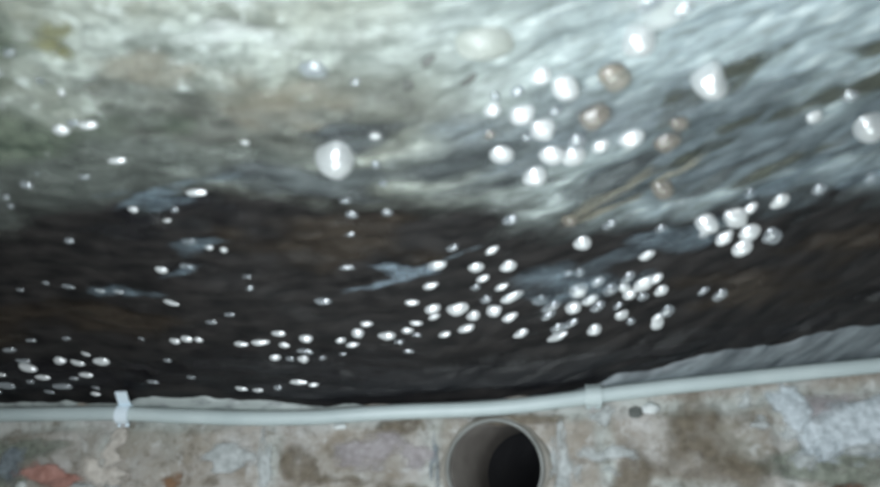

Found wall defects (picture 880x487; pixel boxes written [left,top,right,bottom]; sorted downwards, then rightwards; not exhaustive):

leakage [34,26,70,58]
leakage [854,41,880,57]
leakage [724,56,769,93]
leakage [0,72,880,407]